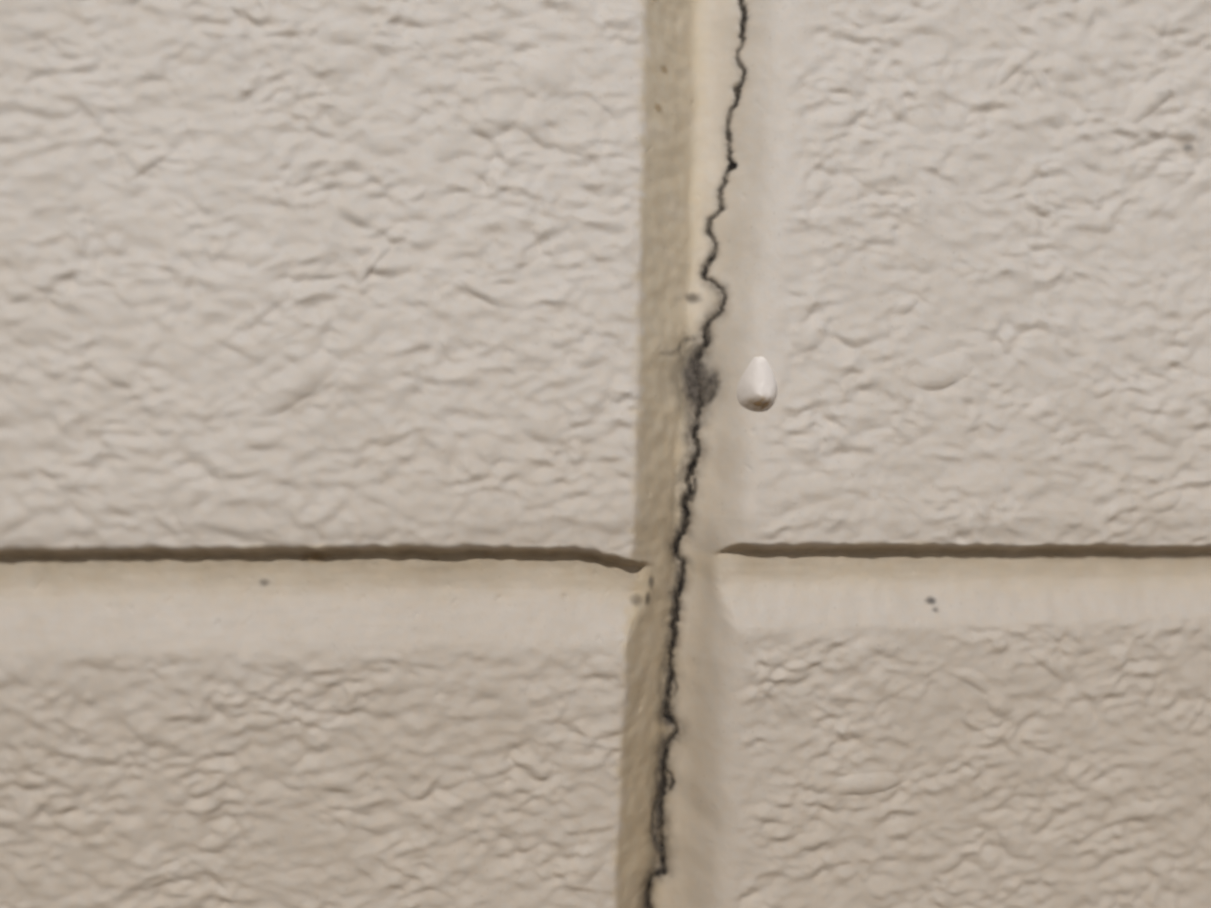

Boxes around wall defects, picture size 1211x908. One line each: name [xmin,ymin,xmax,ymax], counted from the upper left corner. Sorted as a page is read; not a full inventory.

crack [644,0,747,908]